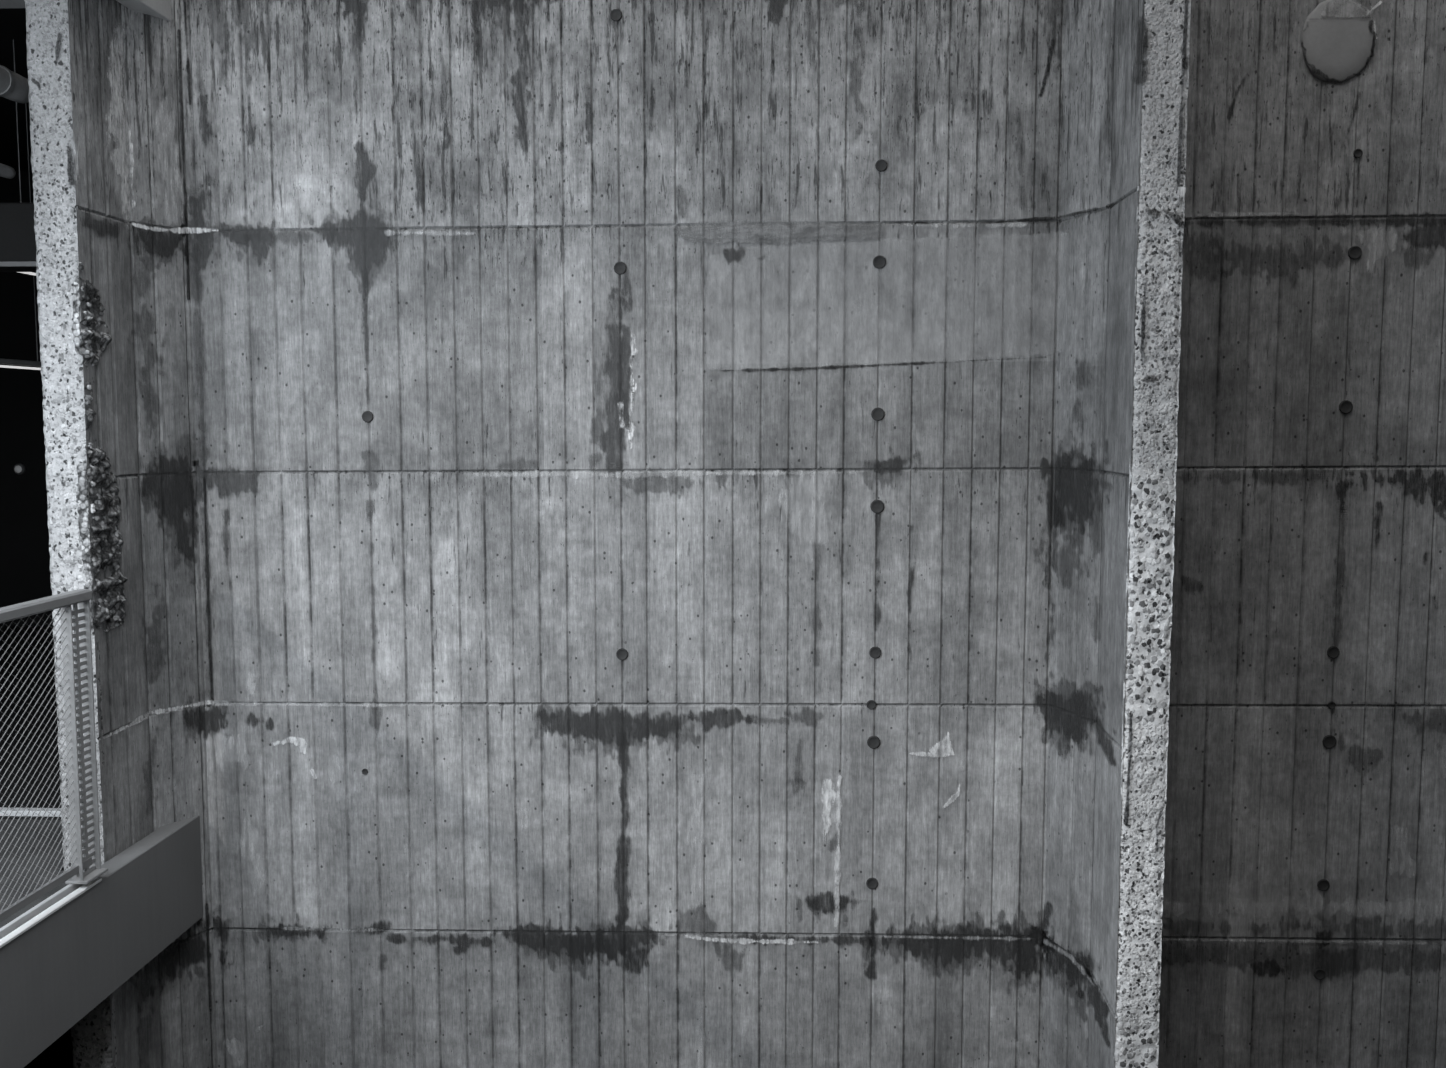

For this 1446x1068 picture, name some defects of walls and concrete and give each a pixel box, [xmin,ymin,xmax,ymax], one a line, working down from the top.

leakage [769,0,809,24]
leakage [469,0,542,151]
leakage [1039,33,1055,97]
leakage [82,26,397,354]
leakage [1182,213,1446,267]
leakage [591,271,682,494]
leakage [864,455,919,478]
leakage [1036,443,1109,659]
leakage [110,700,228,738]
leakage [1035,679,1115,767]
leakage [357,705,754,973]
leakage [262,921,324,938]